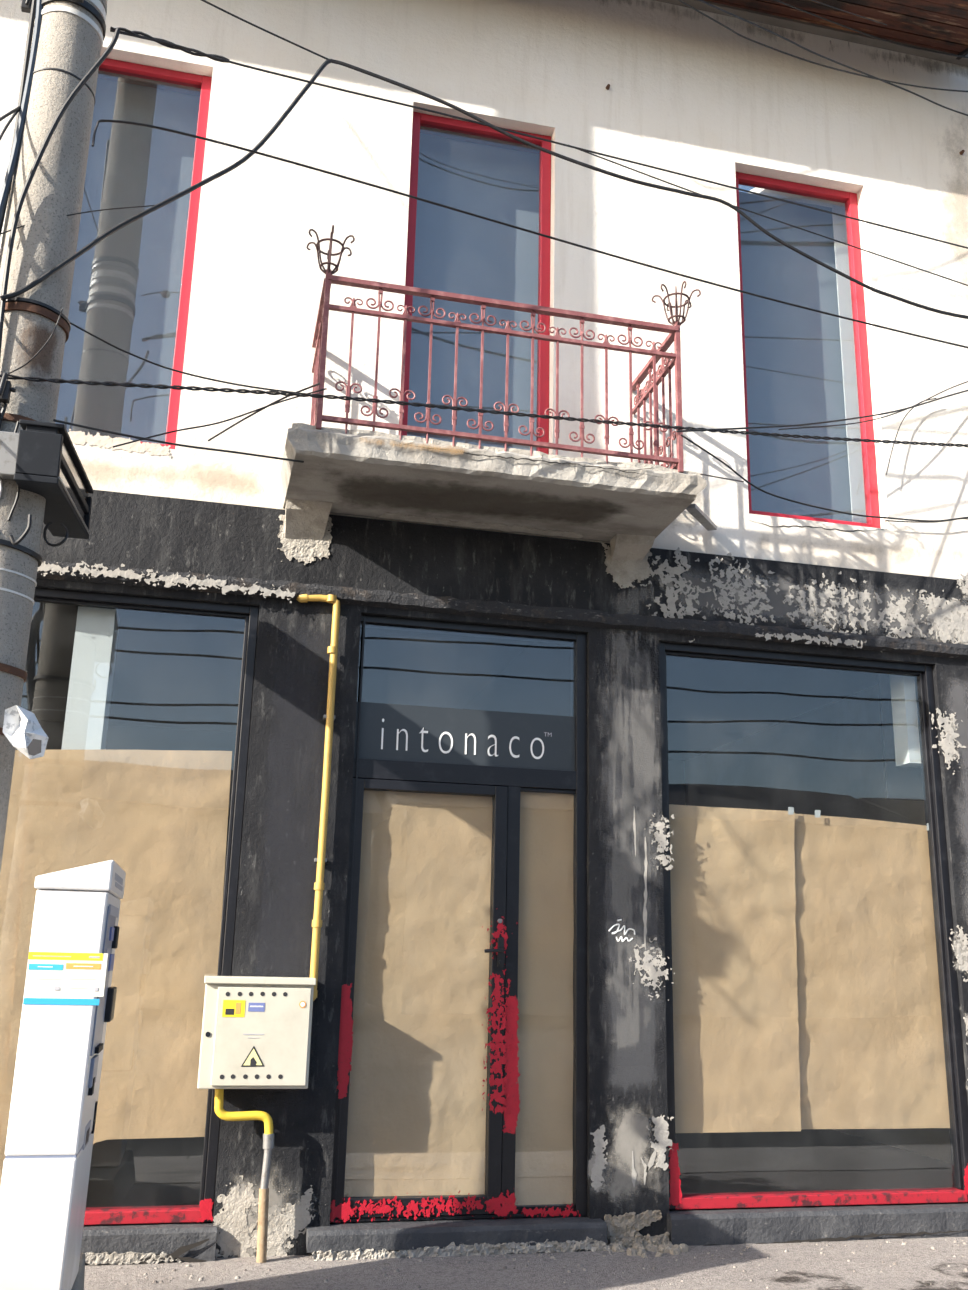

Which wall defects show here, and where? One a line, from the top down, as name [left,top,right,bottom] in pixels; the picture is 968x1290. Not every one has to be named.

peeling [37,561,295,603]
peeling [601,541,968,652]
peeling [929,708,966,775]
peeling [629,937,675,1001]
peeling [950,925,968,982]
flaking render [197,1175,581,1258]
spalling [312,1115,682,1261]
leakage [775,1272,860,1290]
leakage [902,1263,968,1290]